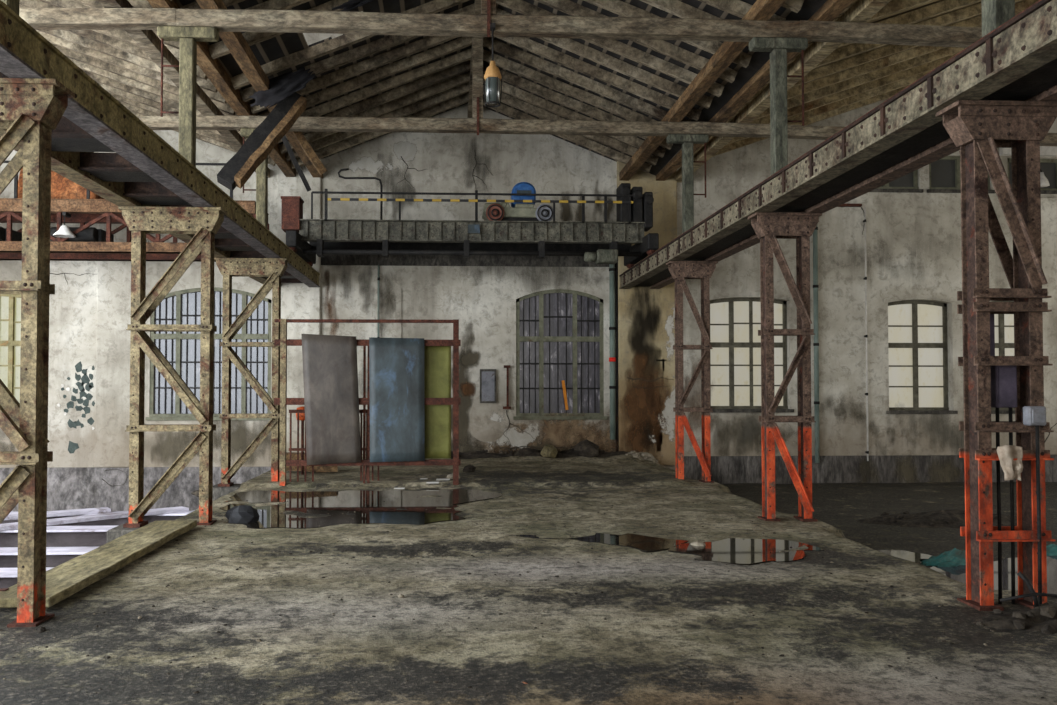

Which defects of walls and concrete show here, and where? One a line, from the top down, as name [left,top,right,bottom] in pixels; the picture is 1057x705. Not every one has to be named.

damp [629,291,661,375]
peeling [57,361,95,430]
spalling [483,413,616,453]